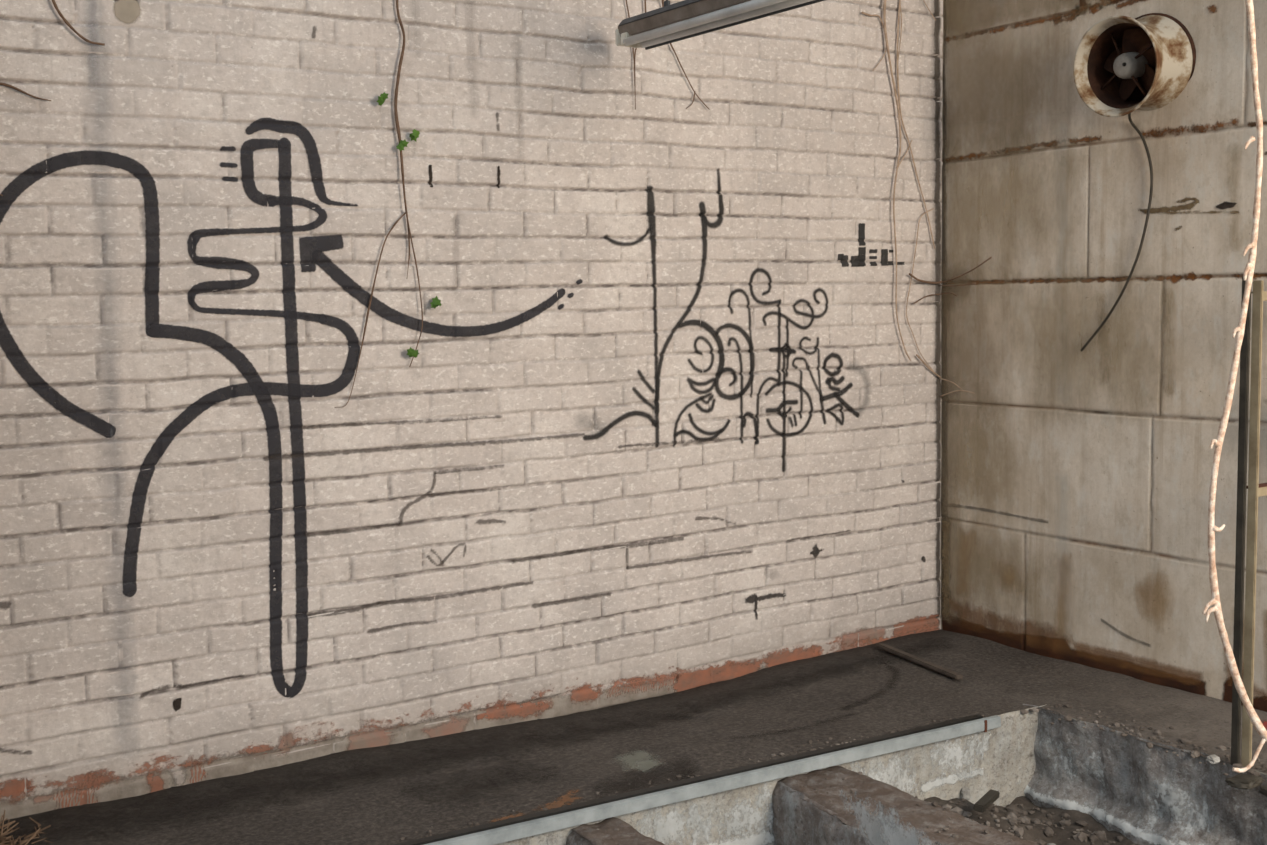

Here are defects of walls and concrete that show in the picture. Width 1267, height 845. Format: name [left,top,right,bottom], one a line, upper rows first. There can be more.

corrosion [945,0,1146,42]
corrosion [942,136,1102,162]
corrosion [1142,119,1267,137]
corrosion [943,272,1212,285]
corrosion [1223,667,1267,712]
peeling [0,614,940,822]